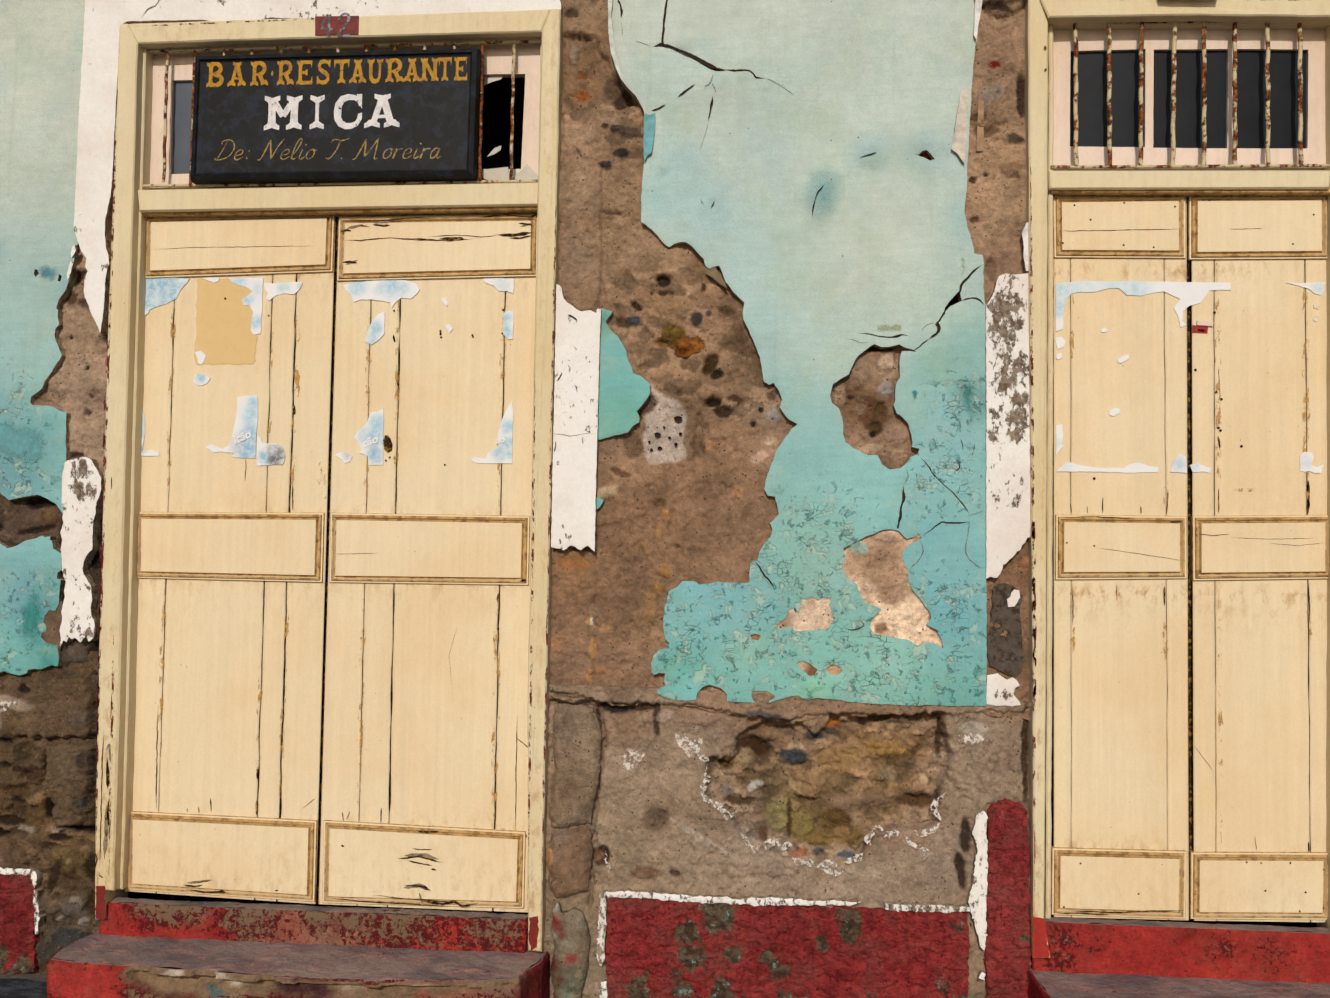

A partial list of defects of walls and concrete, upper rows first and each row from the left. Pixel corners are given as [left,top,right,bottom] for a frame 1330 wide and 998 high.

crack [617,0,791,150]
spalling [951,0,1029,306]
spalling [33,245,108,475]
spalling [550,0,796,706]
spalling [830,346,918,469]
crack [849,265,984,350]
spalling [0,493,63,548]
spalling [41,572,100,692]
spalling [89,517,103,619]
peeling [776,597,834,631]
spalling [843,529,943,648]
spalling [982,538,1030,721]